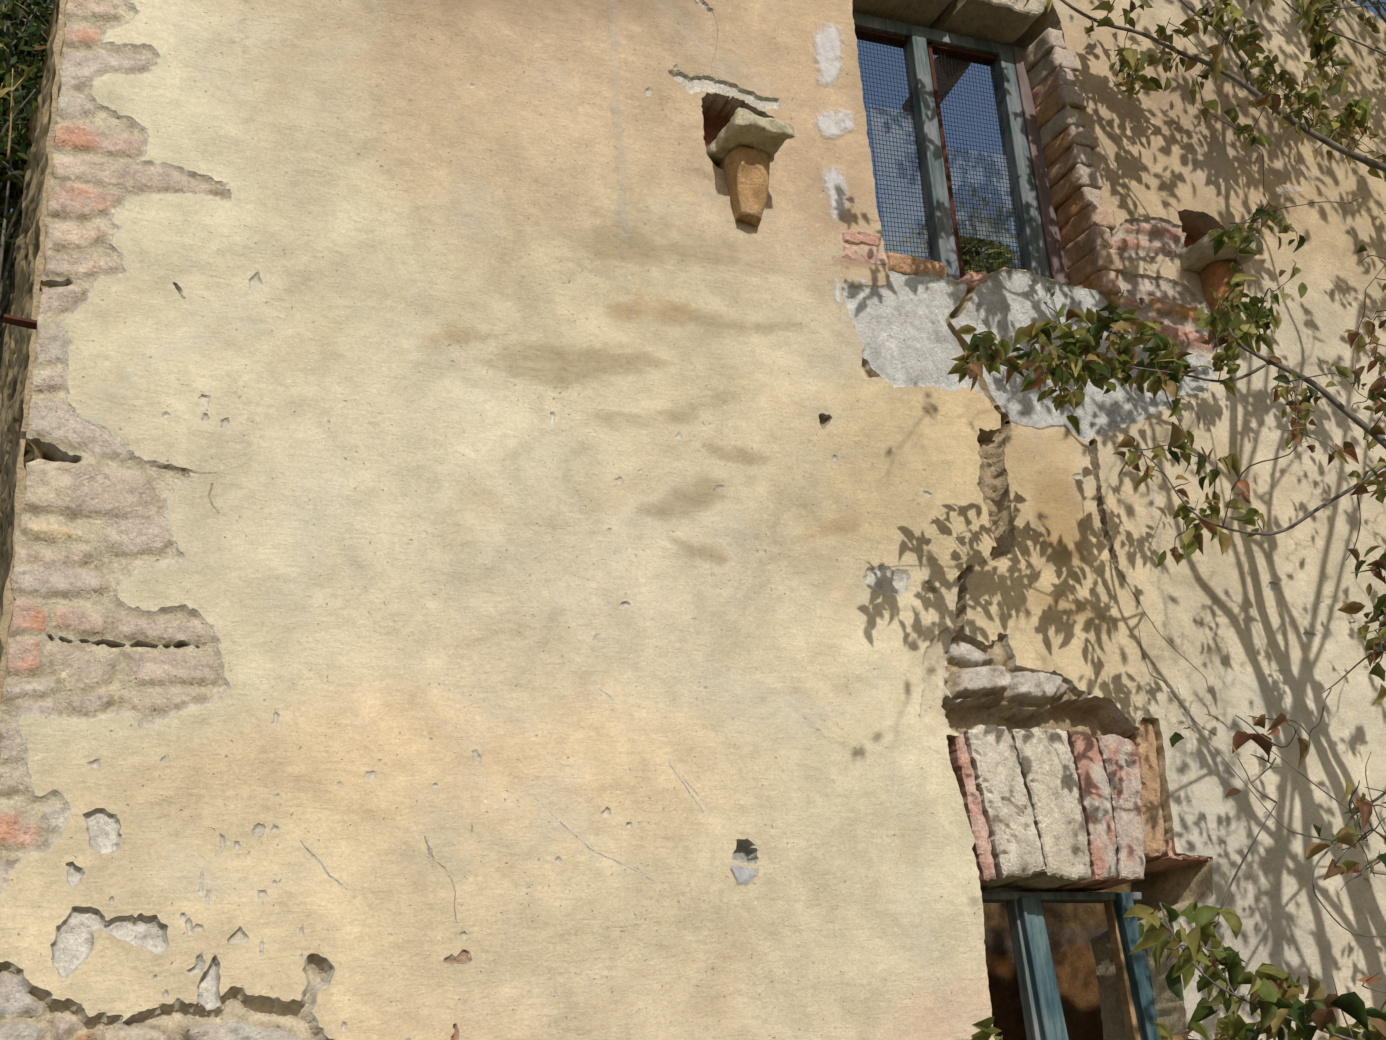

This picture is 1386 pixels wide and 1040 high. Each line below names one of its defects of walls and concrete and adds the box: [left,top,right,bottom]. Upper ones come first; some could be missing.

flaking render [248,271,263,292]
flaking render [1099,217,1220,360]
flaking render [861,357,882,379]
flaking render [0,0,232,895]
crack [945,280,1228,736]
spalling [918,627,1140,741]
flaking render [219,821,279,853]
flaking render [50,861,204,979]
spalling [0,924,348,1040]